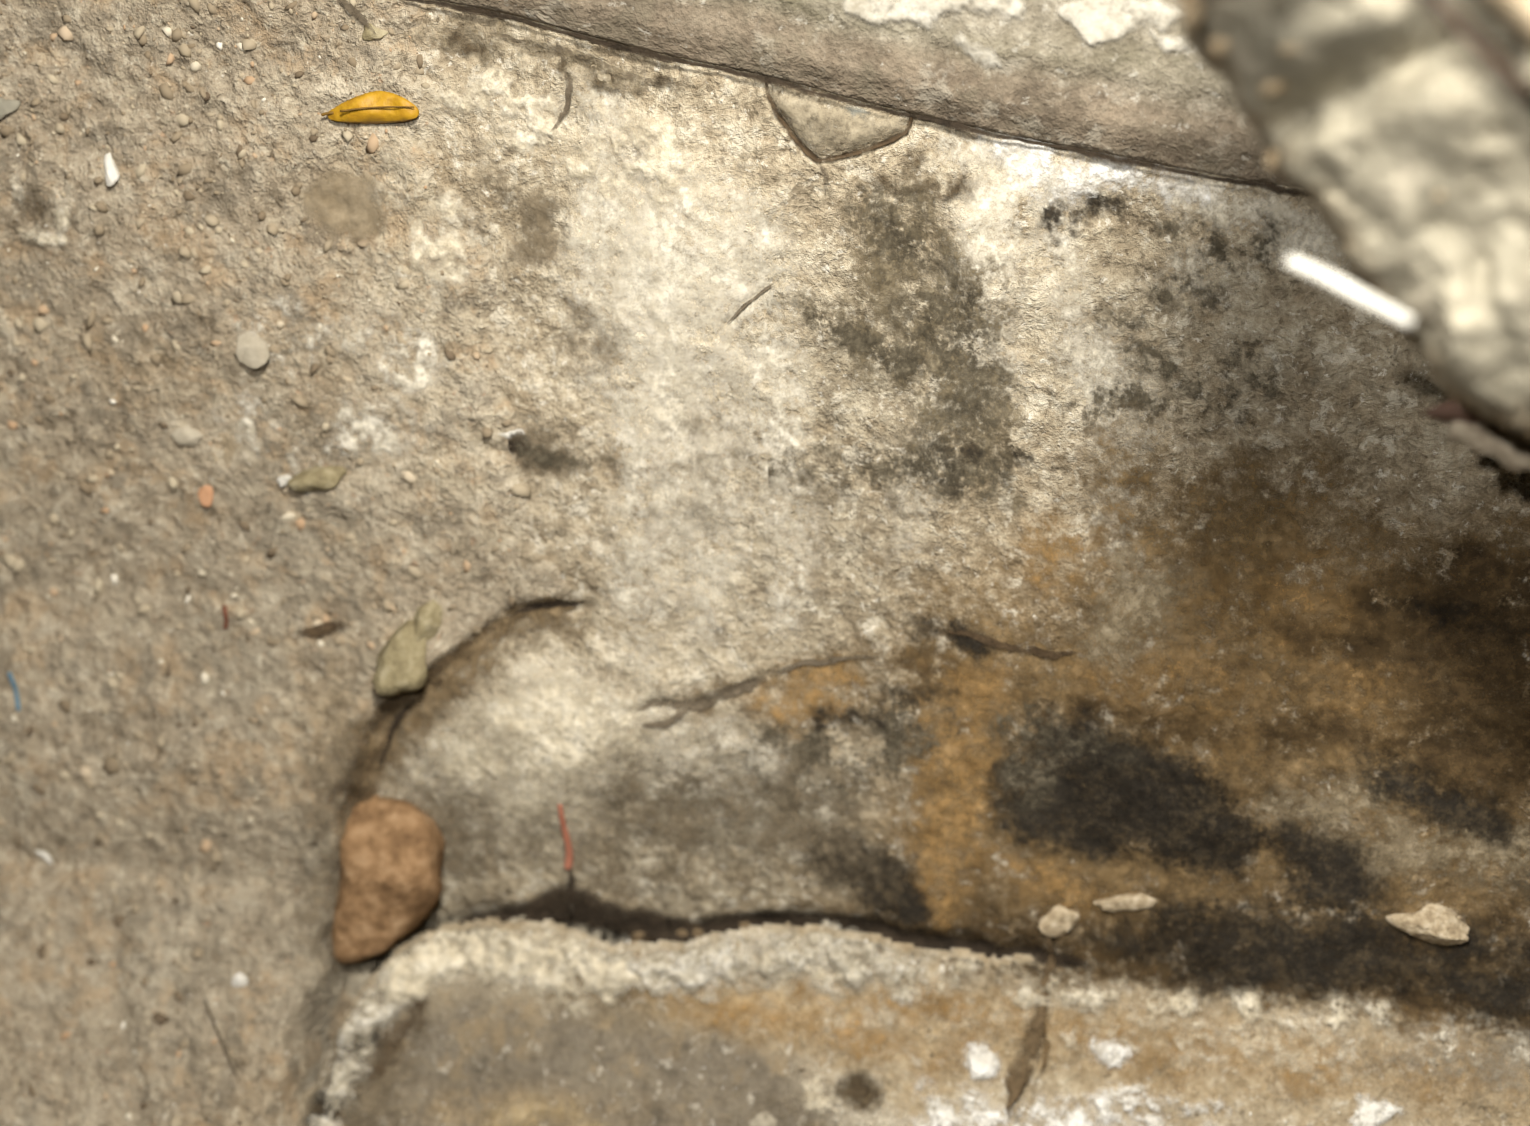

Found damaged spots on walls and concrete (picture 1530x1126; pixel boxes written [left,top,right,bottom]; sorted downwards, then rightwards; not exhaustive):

leakage [217,394,279,450]
crack [296,620,351,637]
crack [341,597,584,815]
leakage [290,68,1357,1126]
crack [637,630,1075,728]
crack [443,867,1087,1115]
leakage [989,703,1530,1087]
leakage [1350,1095,1401,1126]